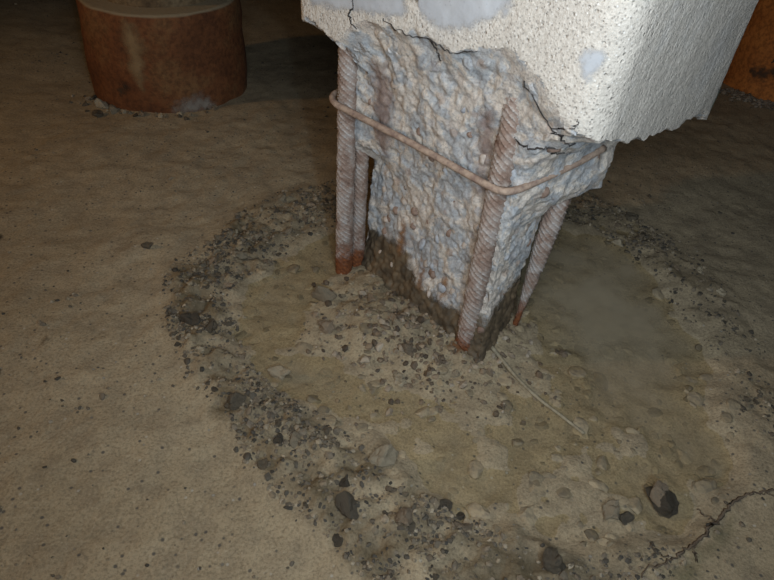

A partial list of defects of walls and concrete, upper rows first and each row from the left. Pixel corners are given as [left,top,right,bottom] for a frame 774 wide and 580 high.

crack [383,18,477,61]
rust [373,67,391,150]
crack [514,81,579,155]
spalling [302,0,652,334]
crack [641,488,774,578]